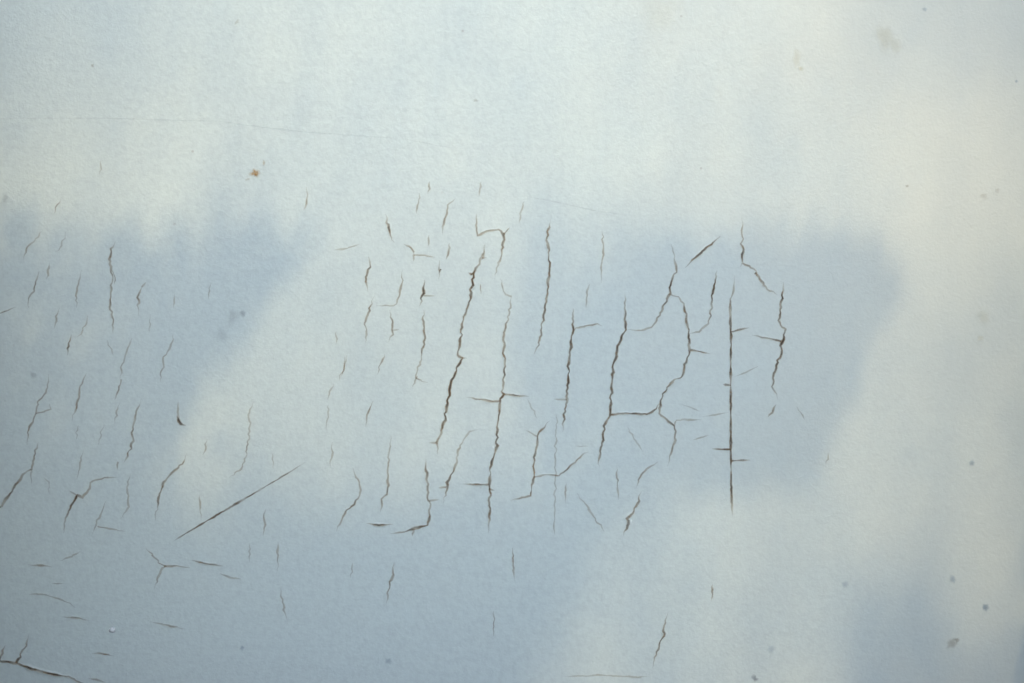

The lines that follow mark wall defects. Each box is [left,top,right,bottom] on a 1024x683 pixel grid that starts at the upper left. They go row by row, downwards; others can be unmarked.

crack [384,222,412,249]
crack [106,248,139,323]
crack [340,228,520,532]
crack [530,227,785,530]
crack [126,414,138,456]
crack [0,425,37,510]
crack [155,462,184,504]
crack [64,494,79,521]
crack [1,643,82,683]